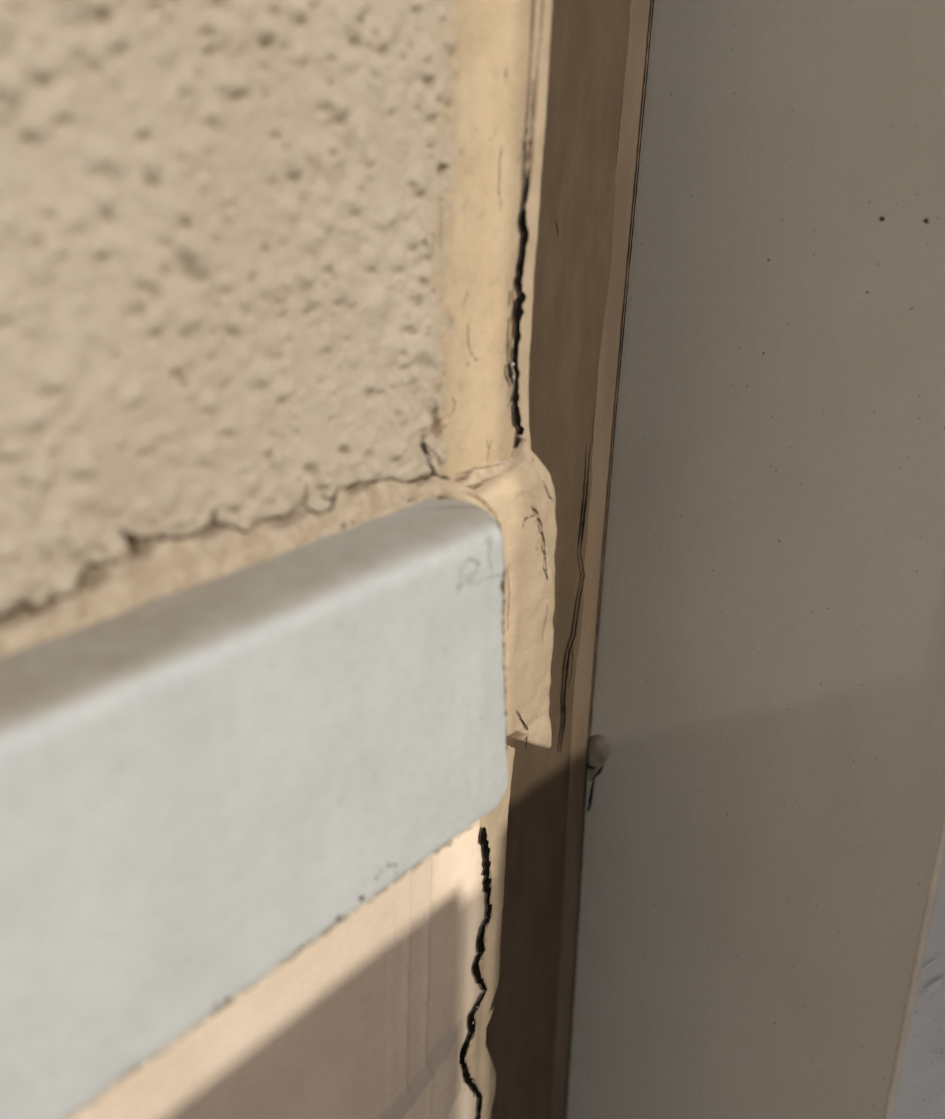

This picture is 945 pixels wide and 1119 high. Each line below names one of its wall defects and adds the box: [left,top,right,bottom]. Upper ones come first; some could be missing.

crack [0,68,591,752]
crack [460,827,493,1119]